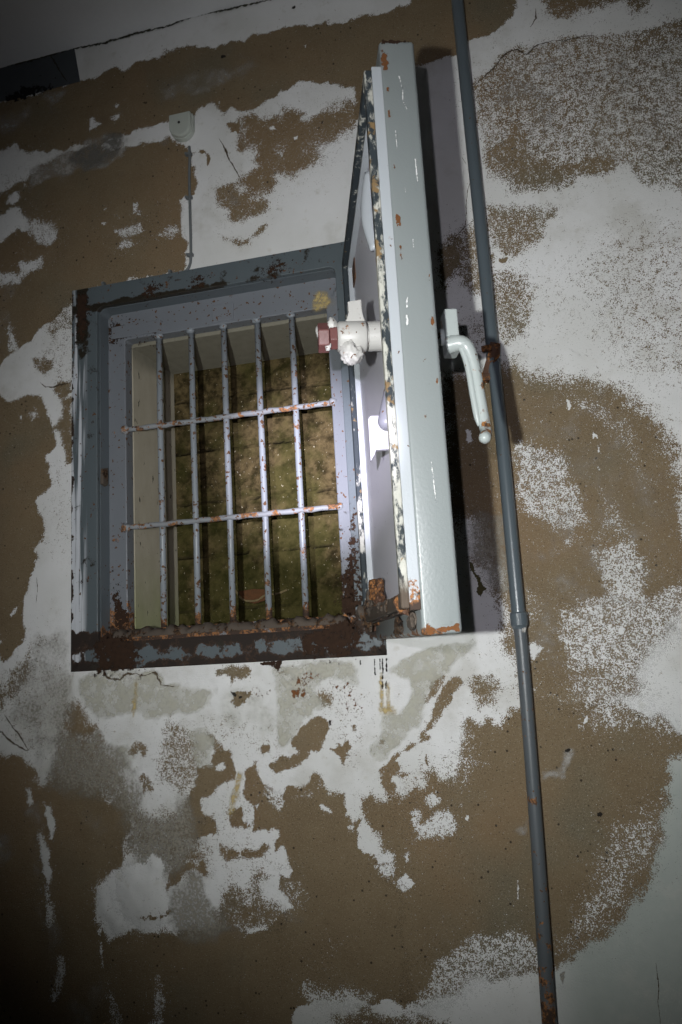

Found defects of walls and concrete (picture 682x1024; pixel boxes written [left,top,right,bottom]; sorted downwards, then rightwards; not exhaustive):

rust [85,570,147,680]
peeling [0,0,538,1024]
rust [260,508,417,698]
peeling [463,0,682,987]